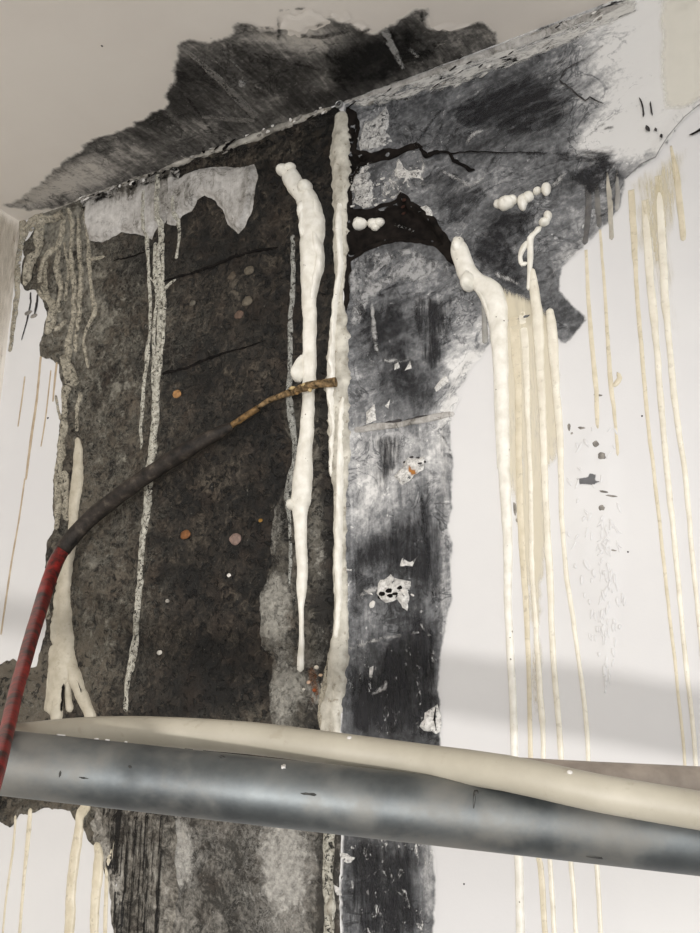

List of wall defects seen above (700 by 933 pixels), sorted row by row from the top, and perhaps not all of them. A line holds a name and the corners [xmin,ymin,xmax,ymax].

efflorescence [8,207,105,530]
efflorescence [284,235,297,586]
spalling [0,0,700,746]
leakage [504,292,556,614]
leakage [646,170,673,253]
spalling [0,796,437,933]